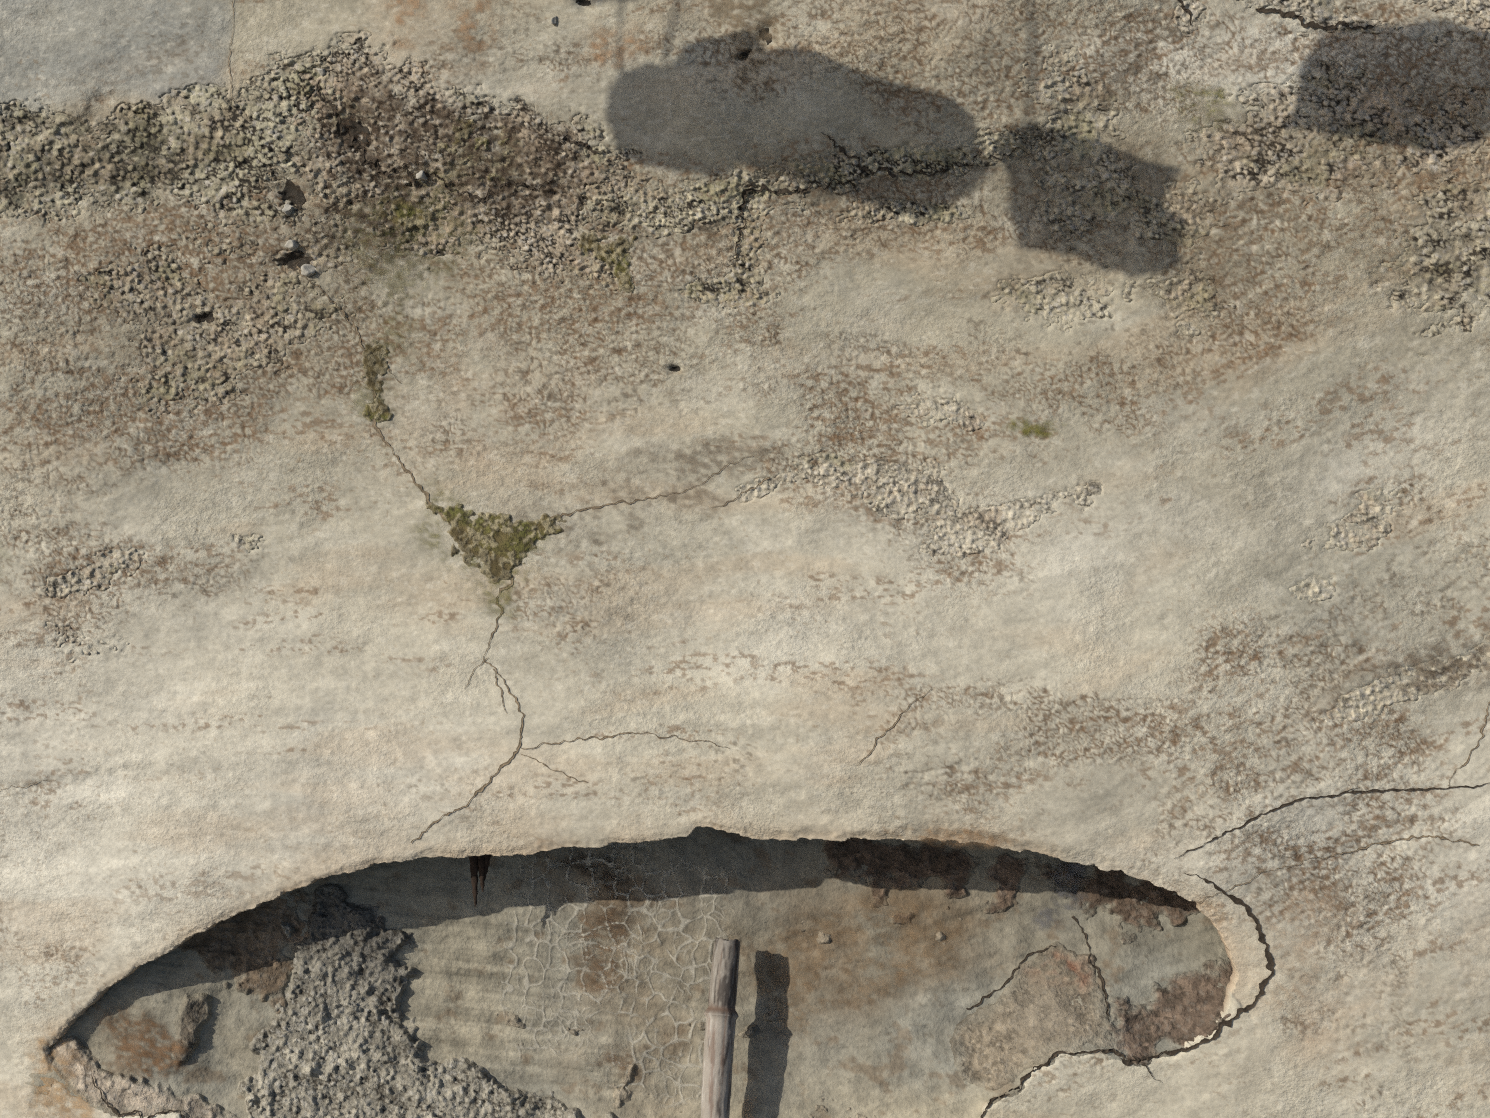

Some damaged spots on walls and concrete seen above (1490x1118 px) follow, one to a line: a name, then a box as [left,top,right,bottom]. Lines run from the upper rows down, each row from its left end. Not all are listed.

water stain [320,88,591,241]
crack [550,455,770,518]
crack [411,576,730,843]
crack [857,689,932,766]
crack [91,1070,183,1118]
crack [501,842,727,1105]
spalling [25,826,1233,1118]
crack [966,702,1490,1118]